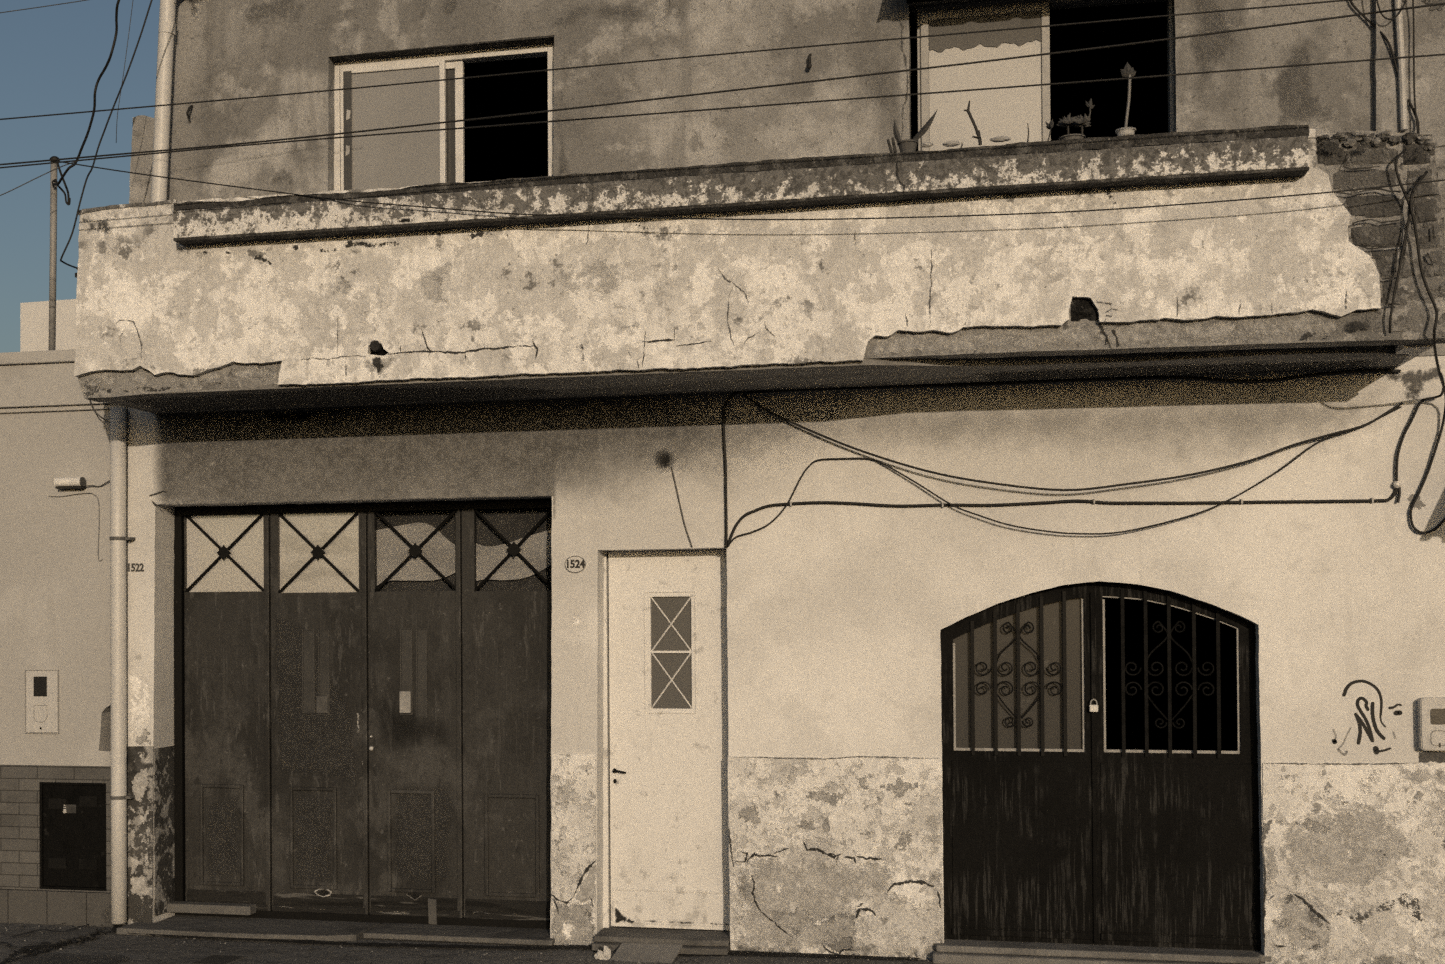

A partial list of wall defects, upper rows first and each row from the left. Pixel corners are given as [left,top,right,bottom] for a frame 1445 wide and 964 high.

spalling [871,130,1445,355]
peeling [421,263,451,303]
peeling [556,260,619,308]
spalling [84,373,175,396]
spalling [196,365,277,387]
peeling [129,674,151,745]
peeling [130,768,150,895]
crack [551,860,596,914]
peeling [553,902,594,946]
peeling [737,774,918,954]
crack [729,830,941,955]
peeling [1261,751,1445,950]